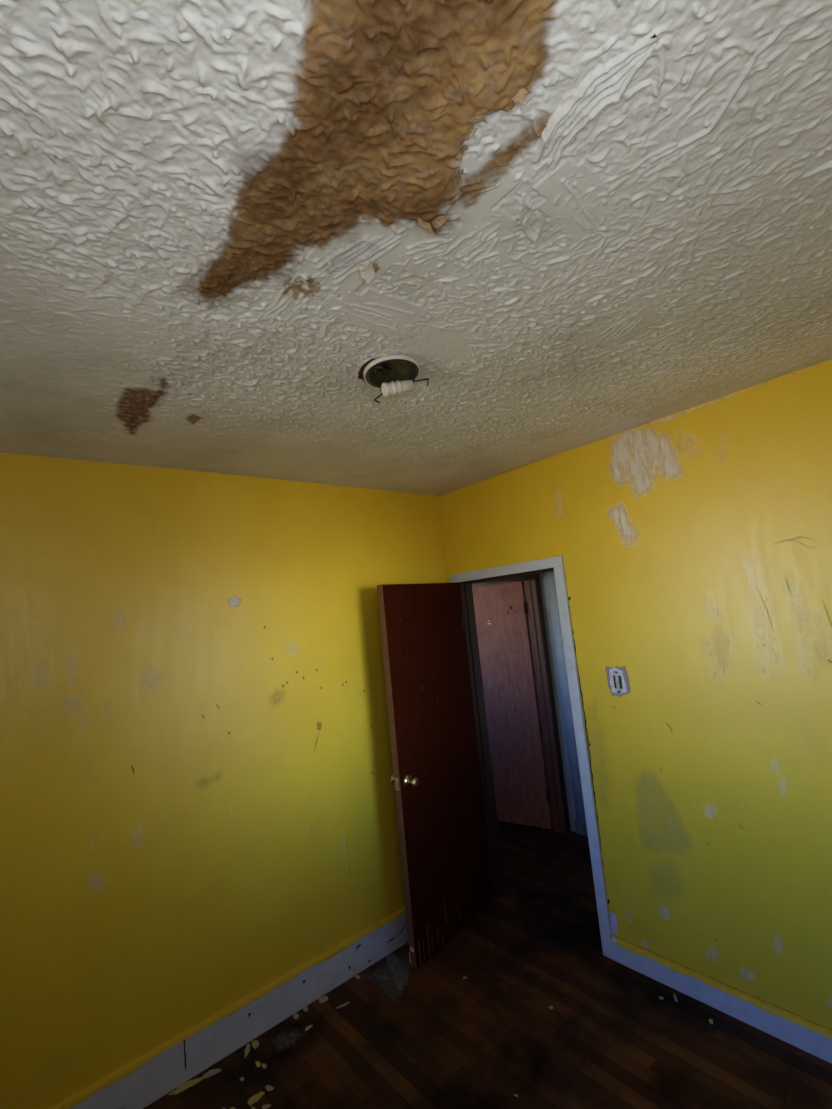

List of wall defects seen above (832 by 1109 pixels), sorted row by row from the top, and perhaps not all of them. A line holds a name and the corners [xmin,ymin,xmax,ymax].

damp [200,0,555,297]
peeling [612,392,740,495]
peeling [610,504,635,545]